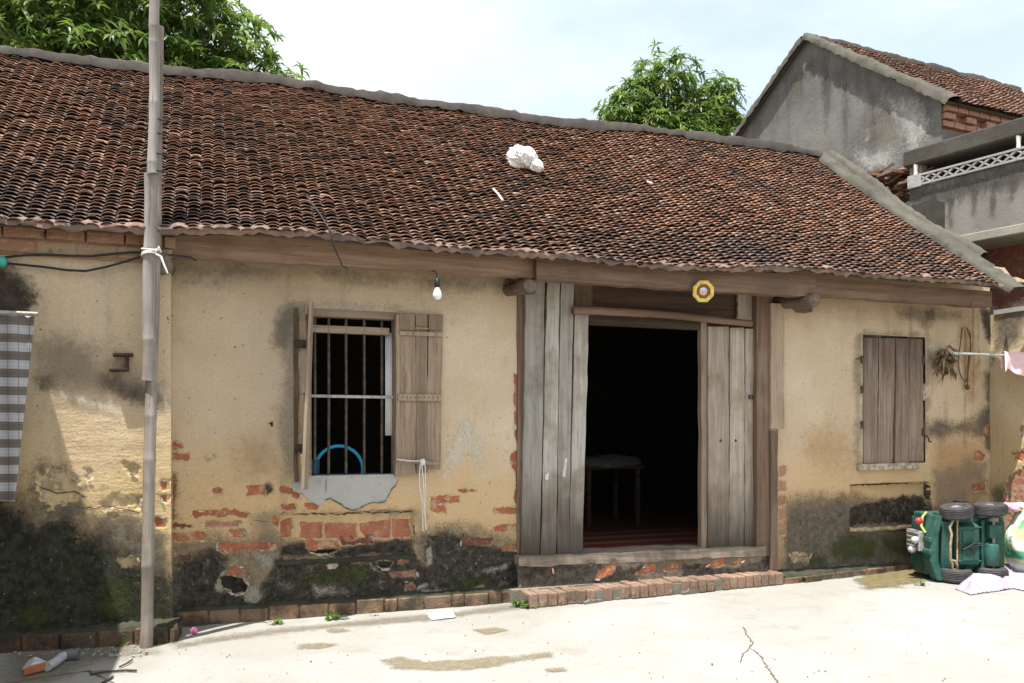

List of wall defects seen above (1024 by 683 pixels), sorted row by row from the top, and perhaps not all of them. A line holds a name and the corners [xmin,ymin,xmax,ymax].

leakage [101,377,158,403]
peeling [122,461,139,477]
spalling [172,440,189,461]
spalling [1002,425,1024,530]
crack [37,485,139,513]
peeling [100,494,142,512]
spalling [430,488,476,514]
spalling [460,490,517,552]
leakage [0,464,518,634]
leakage [783,493,939,589]
spalling [215,566,262,603]
crack [740,627,779,683]